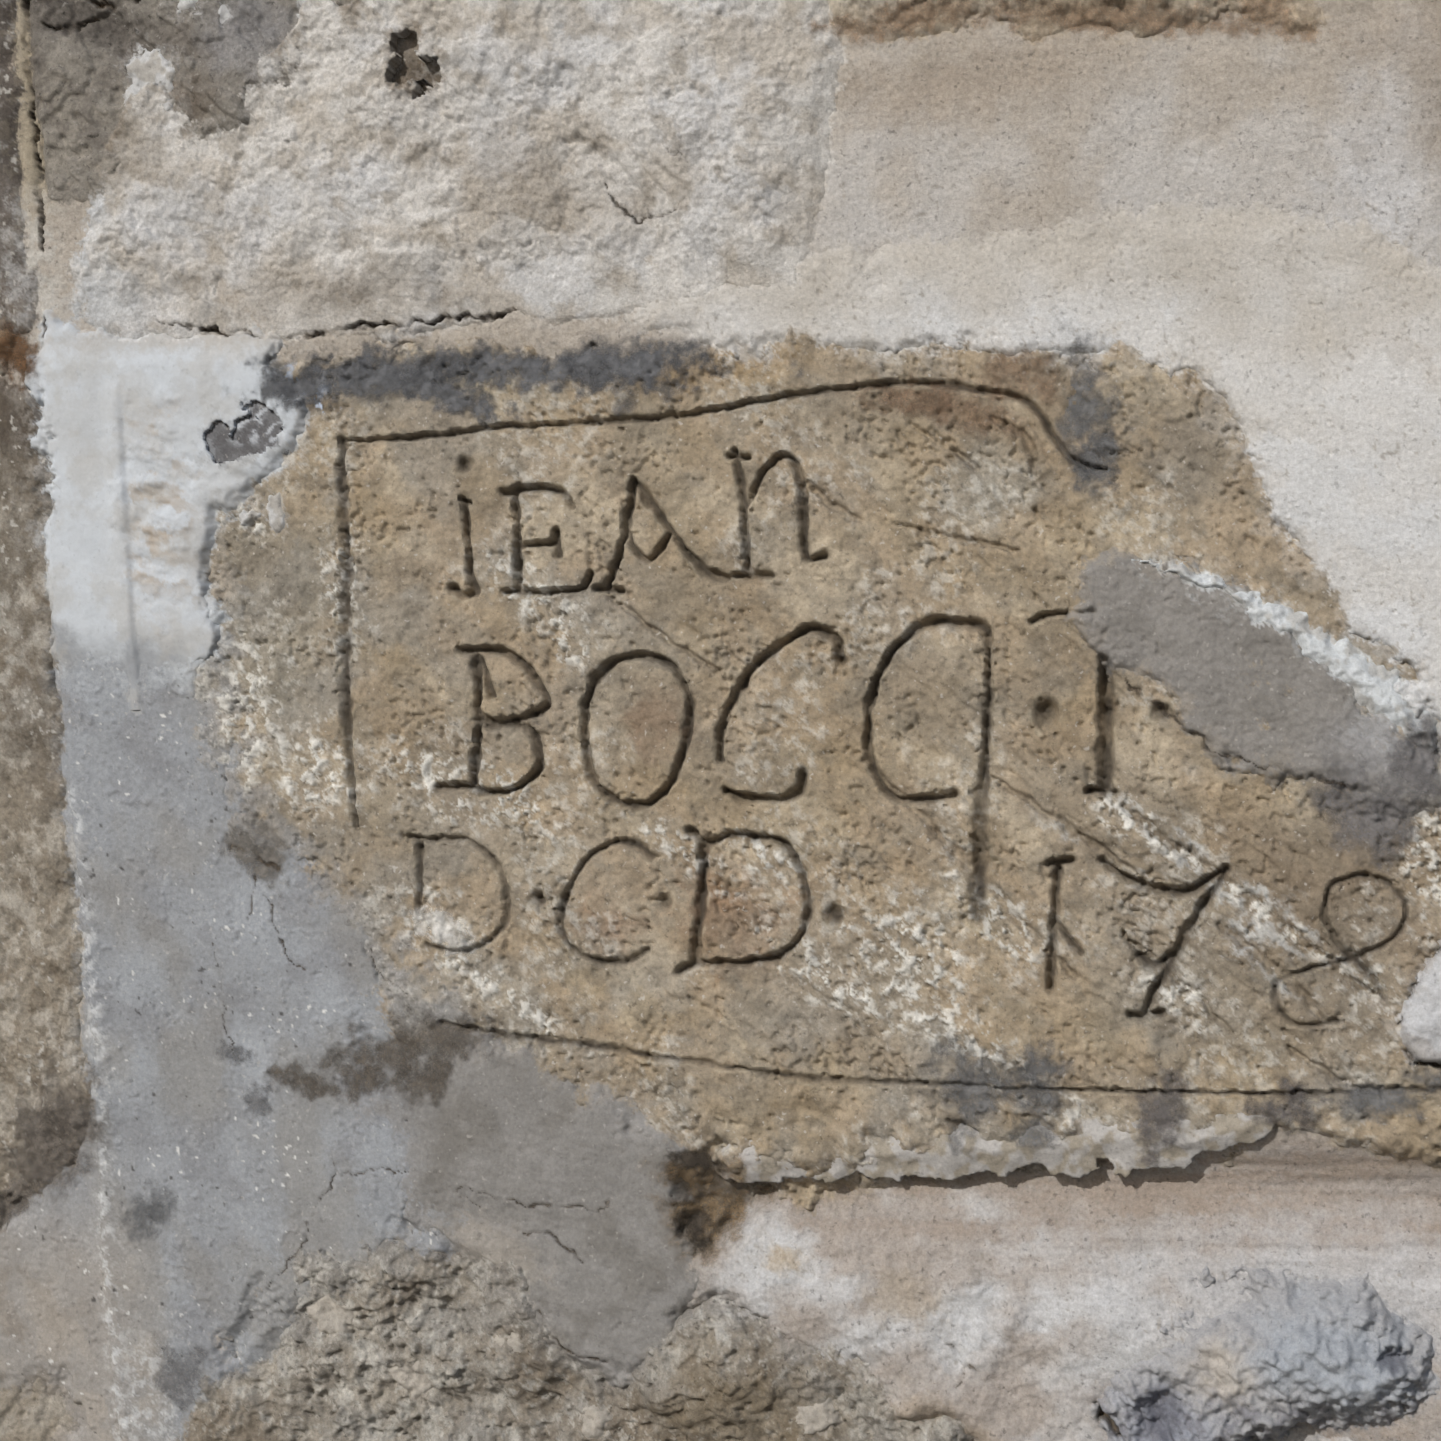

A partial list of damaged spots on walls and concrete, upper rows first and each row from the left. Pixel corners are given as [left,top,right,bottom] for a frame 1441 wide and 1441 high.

spalling [392,33,442,97]
crack [31,89,42,163]
crack [39,198,47,250]
flaking render [205,401,289,463]
flaking render [239,492,285,533]
crack [230,846,306,970]
crack [269,1168,400,1287]